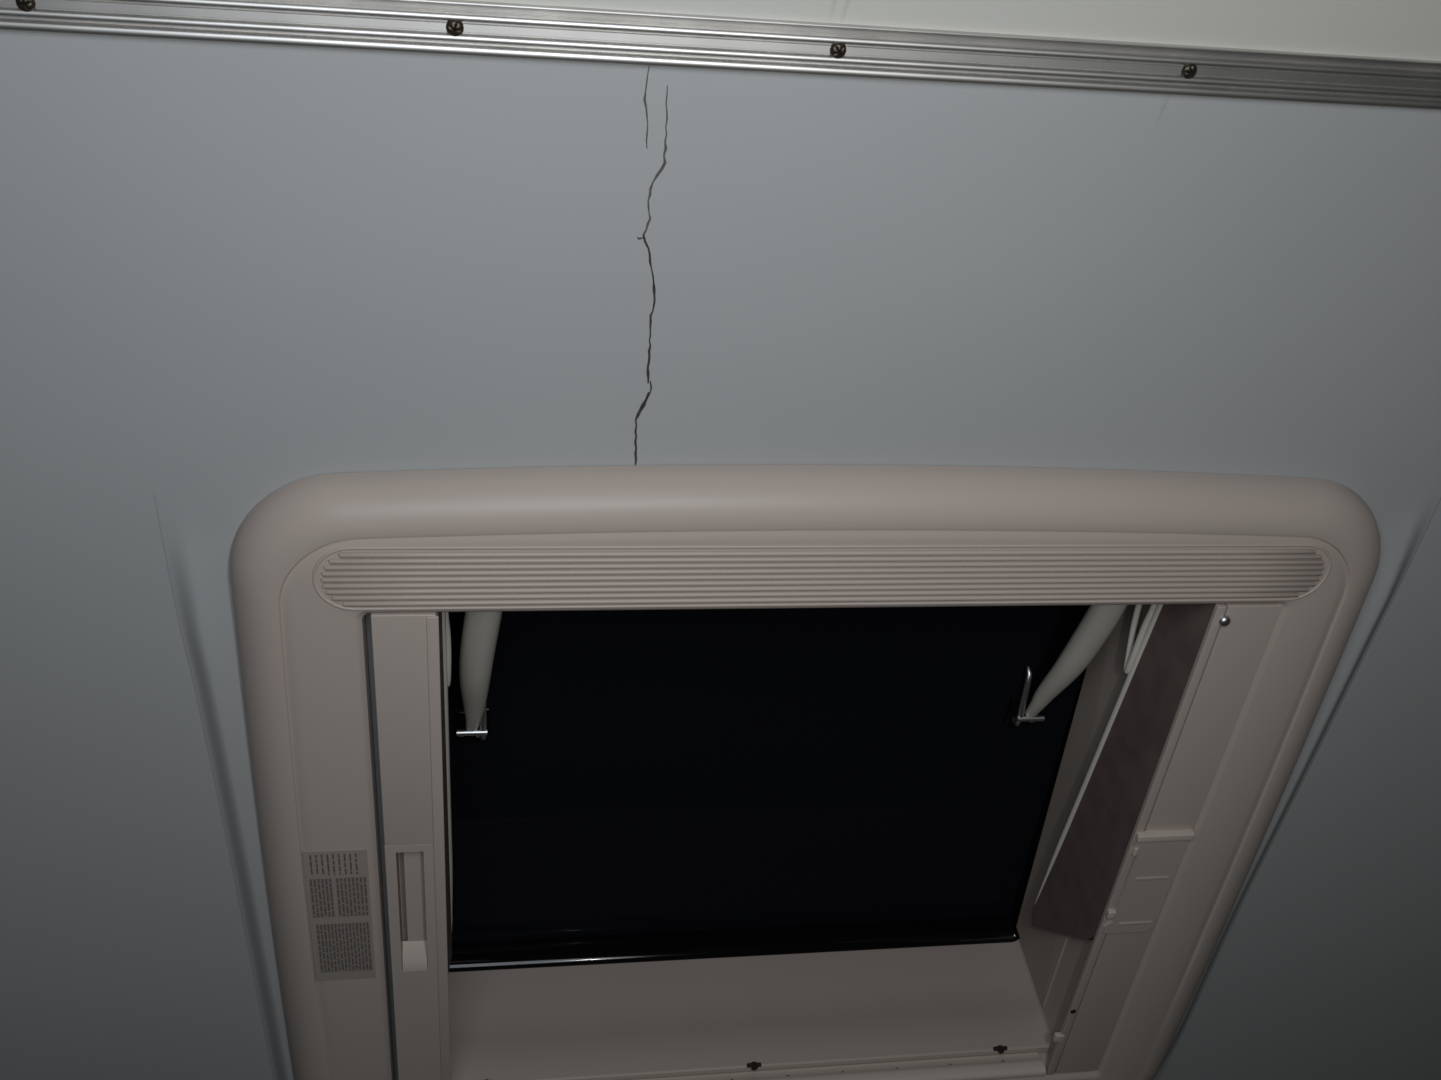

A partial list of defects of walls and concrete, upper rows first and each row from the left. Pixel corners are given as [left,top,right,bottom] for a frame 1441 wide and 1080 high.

crack [634,66,668,465]